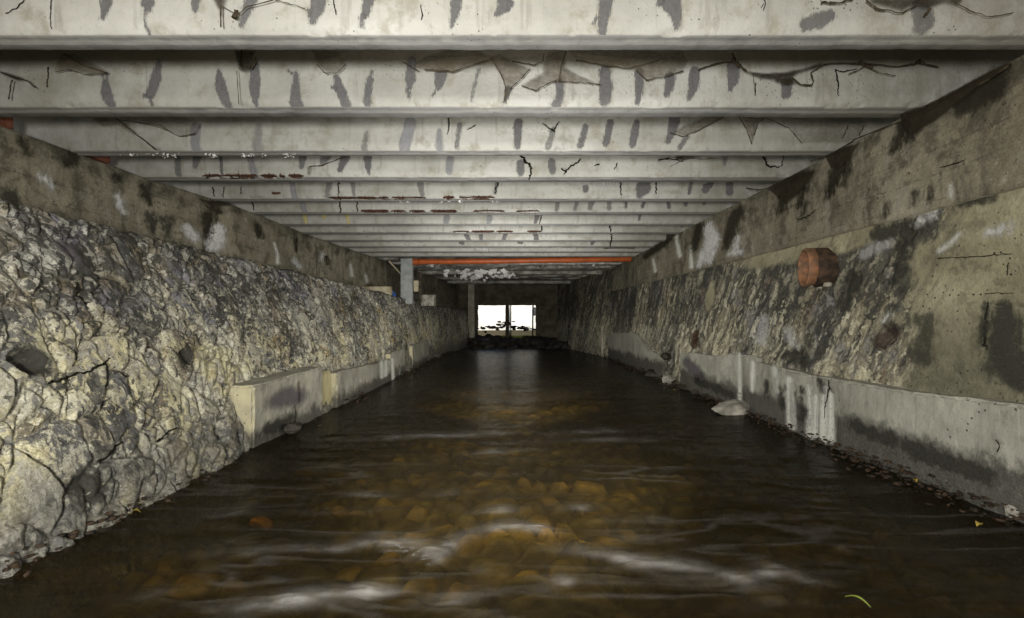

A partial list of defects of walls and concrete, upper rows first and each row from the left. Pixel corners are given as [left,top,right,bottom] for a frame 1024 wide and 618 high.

damp [100,73,116,107]
damp [143,59,162,106]
damp [215,69,231,108]
damp [249,63,260,106]
damp [288,69,304,107]
damp [331,71,374,107]
crack [834,69,856,96]
crack [520,156,533,180]
crack [561,159,622,195]
damp [978,300,1024,392]
crack [48,358,127,384]